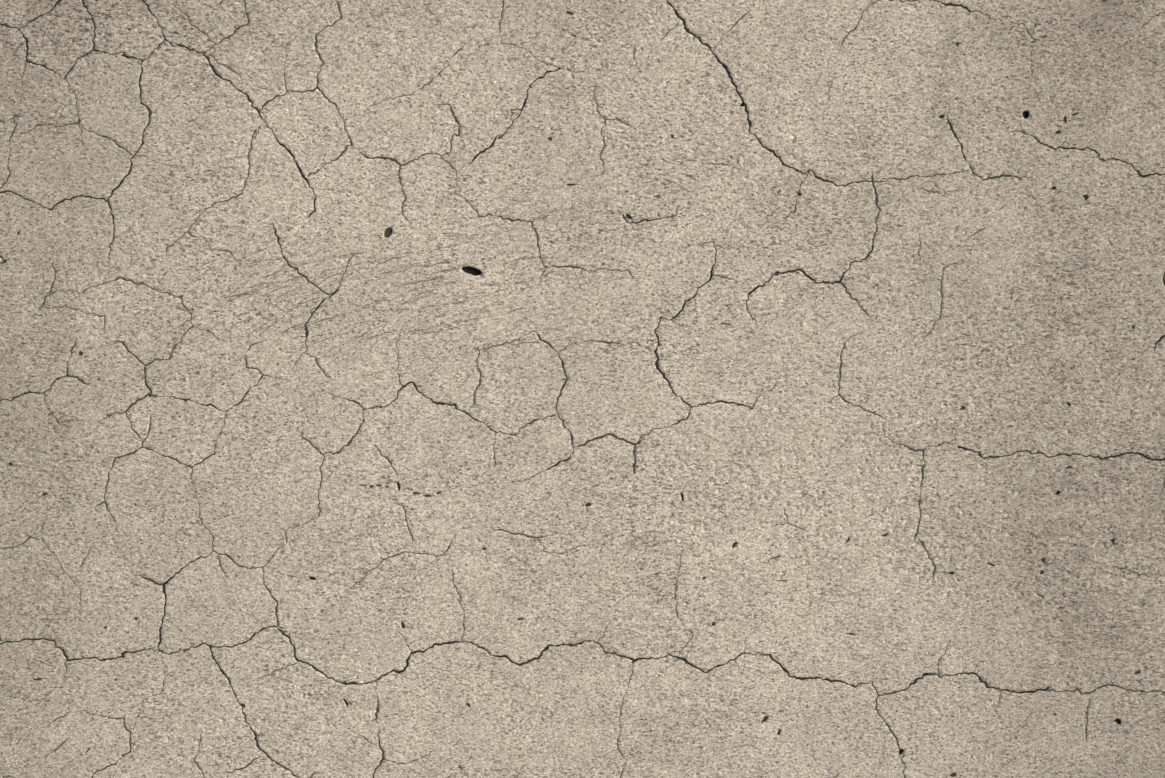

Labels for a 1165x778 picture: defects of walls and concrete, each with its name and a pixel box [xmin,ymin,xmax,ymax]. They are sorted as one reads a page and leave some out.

crack [0,0,637,281]
crack [598,204,679,224]
crack [660,0,1040,327]
crack [1011,130,1165,177]
crack [0,223,1165,778]